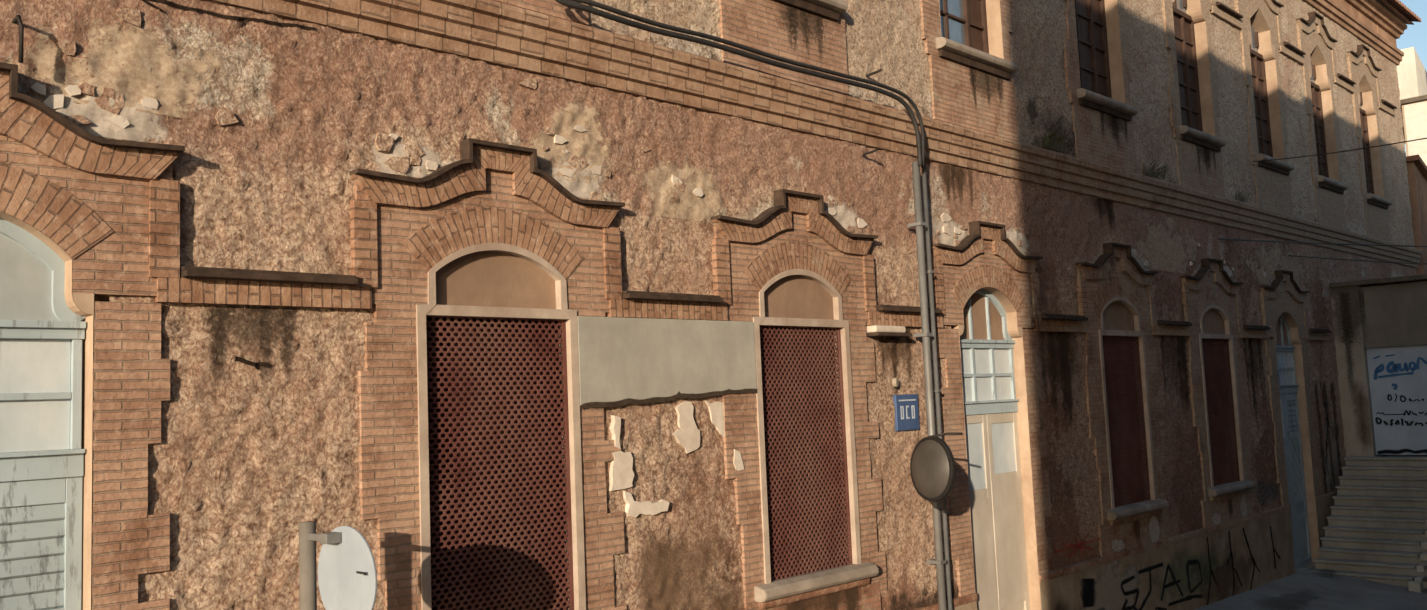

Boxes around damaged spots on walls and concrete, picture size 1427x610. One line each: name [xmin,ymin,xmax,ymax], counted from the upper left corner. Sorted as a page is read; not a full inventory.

peeling [608,415,669,518]
peeling [672,401,744,471]